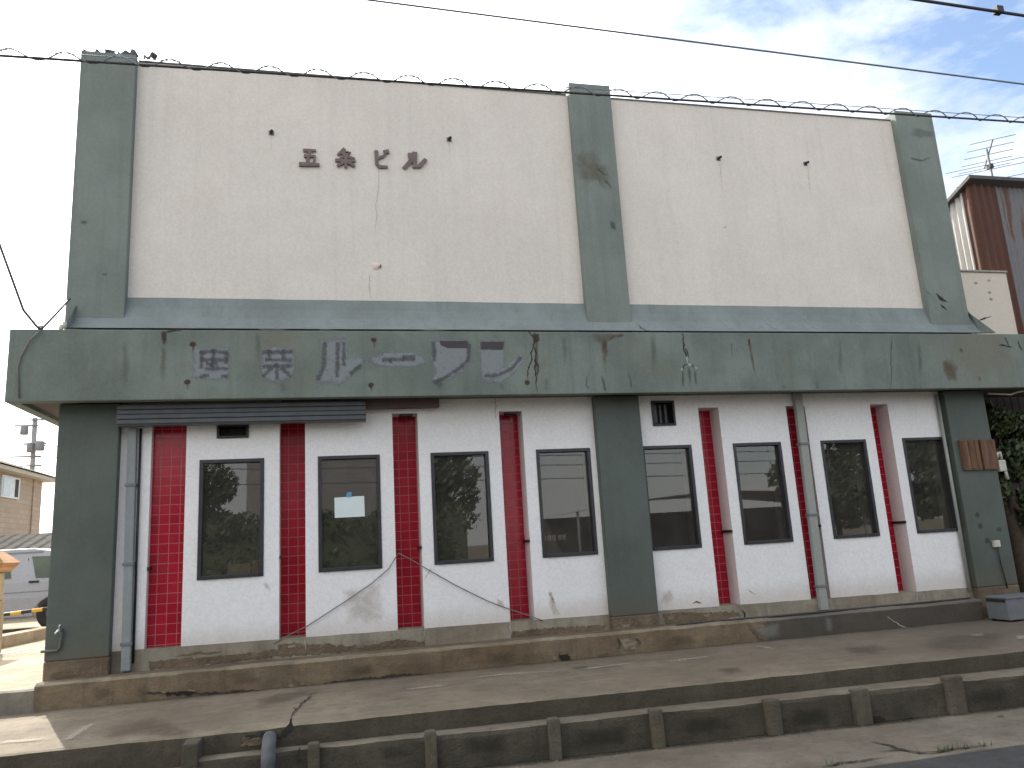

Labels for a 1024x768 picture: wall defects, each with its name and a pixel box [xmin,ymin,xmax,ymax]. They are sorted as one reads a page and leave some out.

crack [525,331,539,387]
crack [681,333,698,371]
spalling [148,639,425,670]